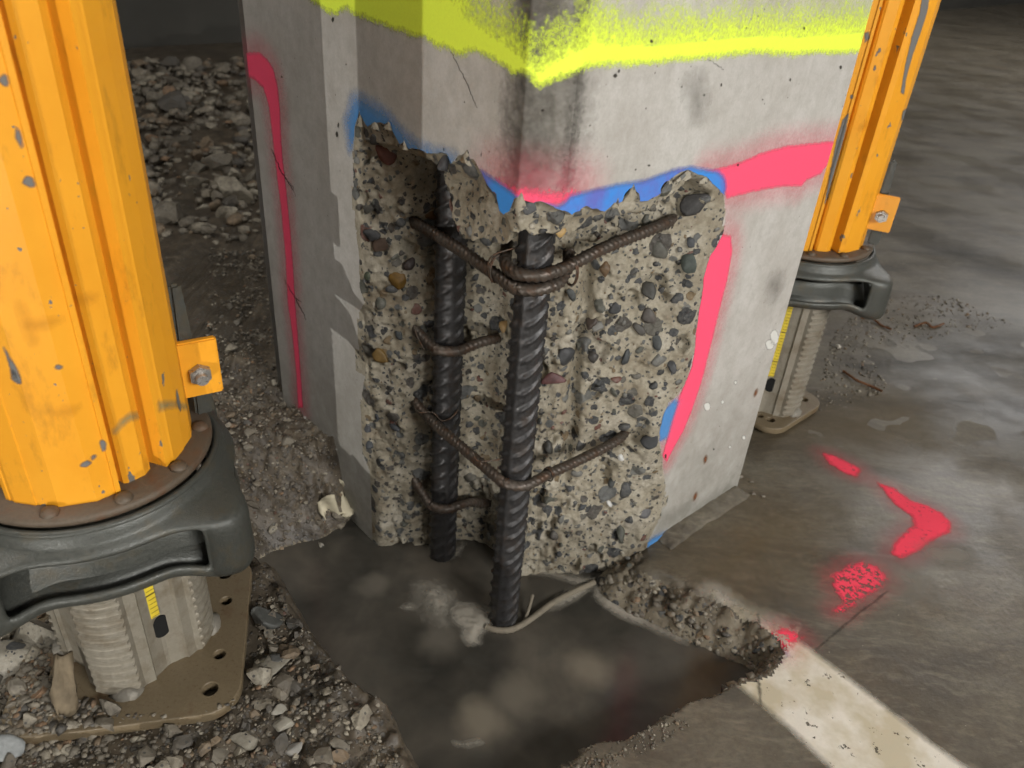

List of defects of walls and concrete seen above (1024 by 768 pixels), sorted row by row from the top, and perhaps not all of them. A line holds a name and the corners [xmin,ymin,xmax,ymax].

spalling [351,111,783,768]